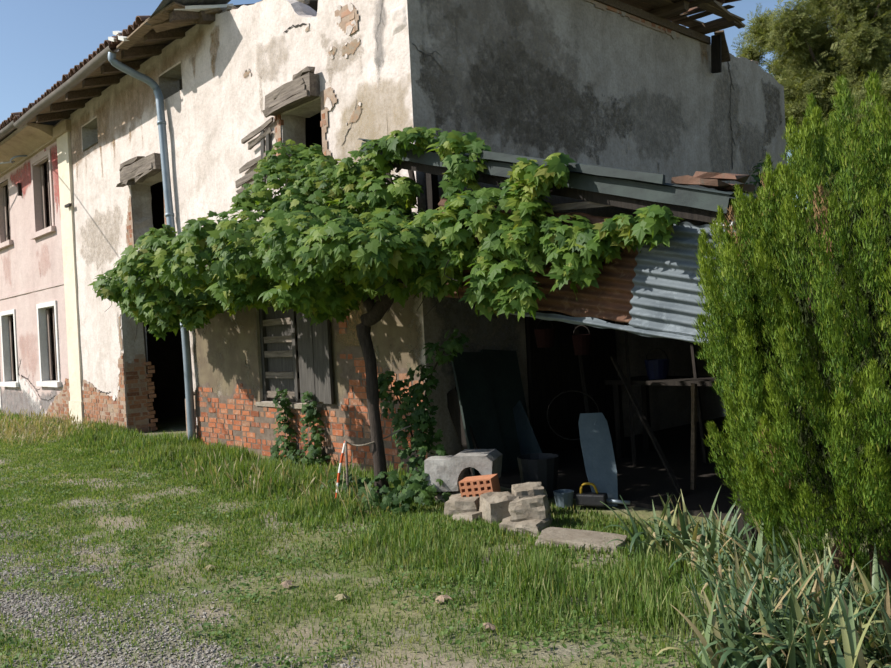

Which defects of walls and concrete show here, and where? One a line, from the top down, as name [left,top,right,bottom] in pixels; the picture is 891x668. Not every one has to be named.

flaking render [319,87,337,156]
flaking render [328,3,360,59]
damp [420,0,672,165]
crack [727,61,735,169]
rust [545,212,610,233]
rust [530,247,638,323]
flaking render [18,375,70,421]
flaking render [82,314,149,433]
flaking render [185,346,374,472]
flaking render [376,363,429,477]